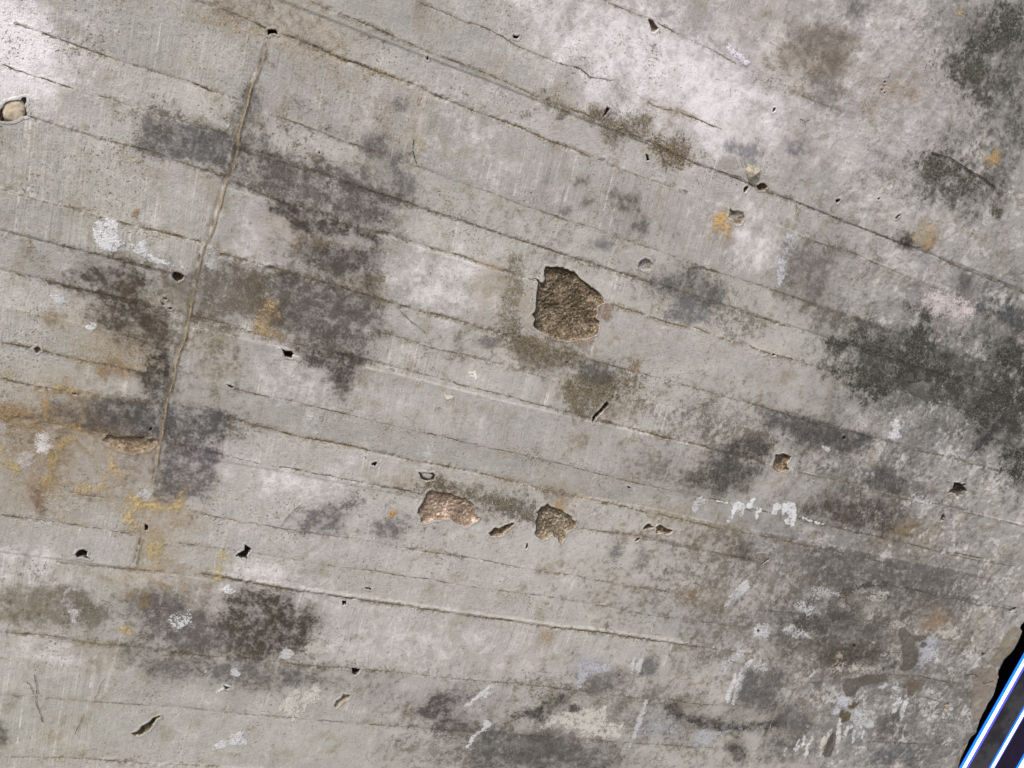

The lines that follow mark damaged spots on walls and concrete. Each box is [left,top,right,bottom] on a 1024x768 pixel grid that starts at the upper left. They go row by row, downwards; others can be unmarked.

water stain [138,118,415,400]
spalling [530,264,607,343]
water stain [913,283,981,329]
spalling [98,432,160,456]
peeling [771,452,793,475]
water stain [859,418,902,469]
spalling [415,471,578,547]
water stain [126,584,324,722]